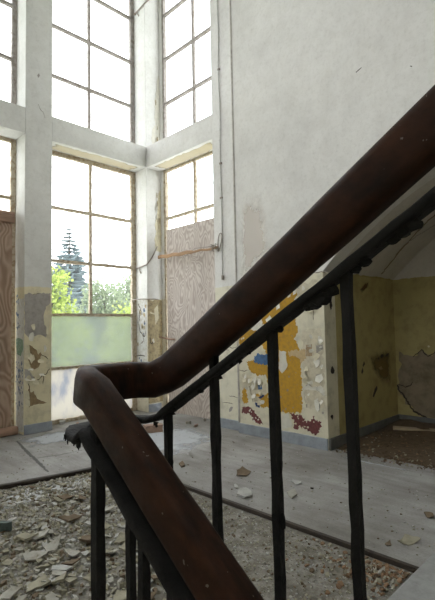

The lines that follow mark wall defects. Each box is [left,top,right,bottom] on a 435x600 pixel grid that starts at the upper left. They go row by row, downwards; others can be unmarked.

peeling [15,293,51,432]
peeling [137,300,163,362]
peeling [230,341,269,424]
peeling [239,279,318,344]
peeling [278,316,335,435]
spalling [398,345,435,418]